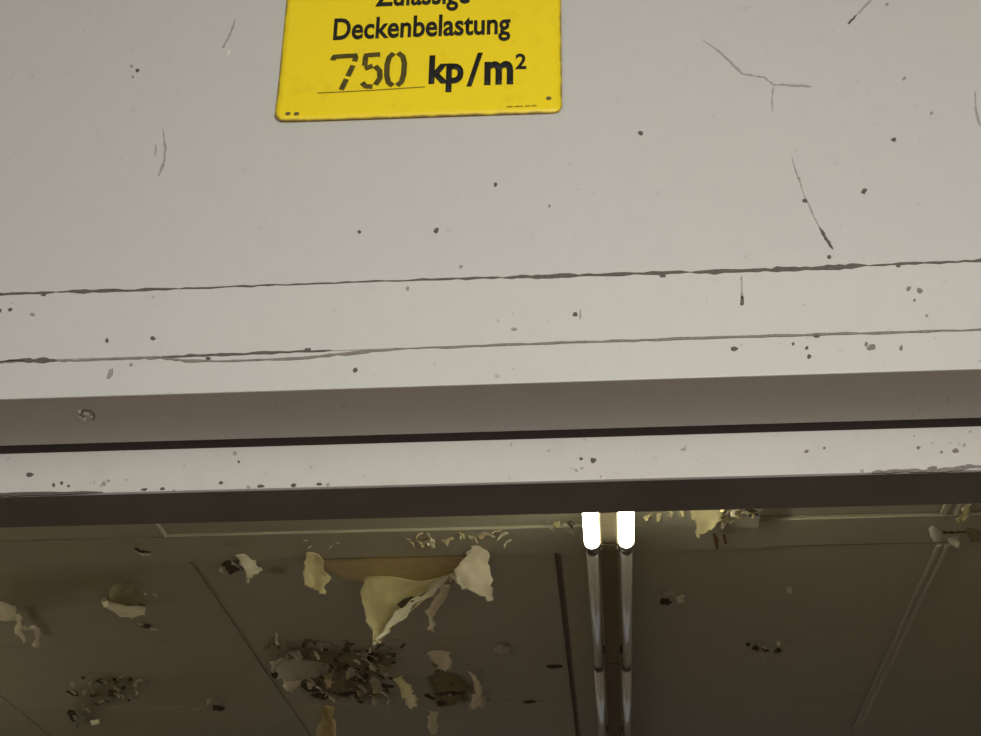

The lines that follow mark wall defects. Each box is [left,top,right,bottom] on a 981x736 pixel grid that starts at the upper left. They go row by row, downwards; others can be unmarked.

crack [702,39,812,112]
peeling [644,509,758,539]
peeling [929,503,981,548]
peeling [219,554,263,584]
peeling [0,601,41,649]
peeling [263,530,512,736]
peeling [65,673,148,728]